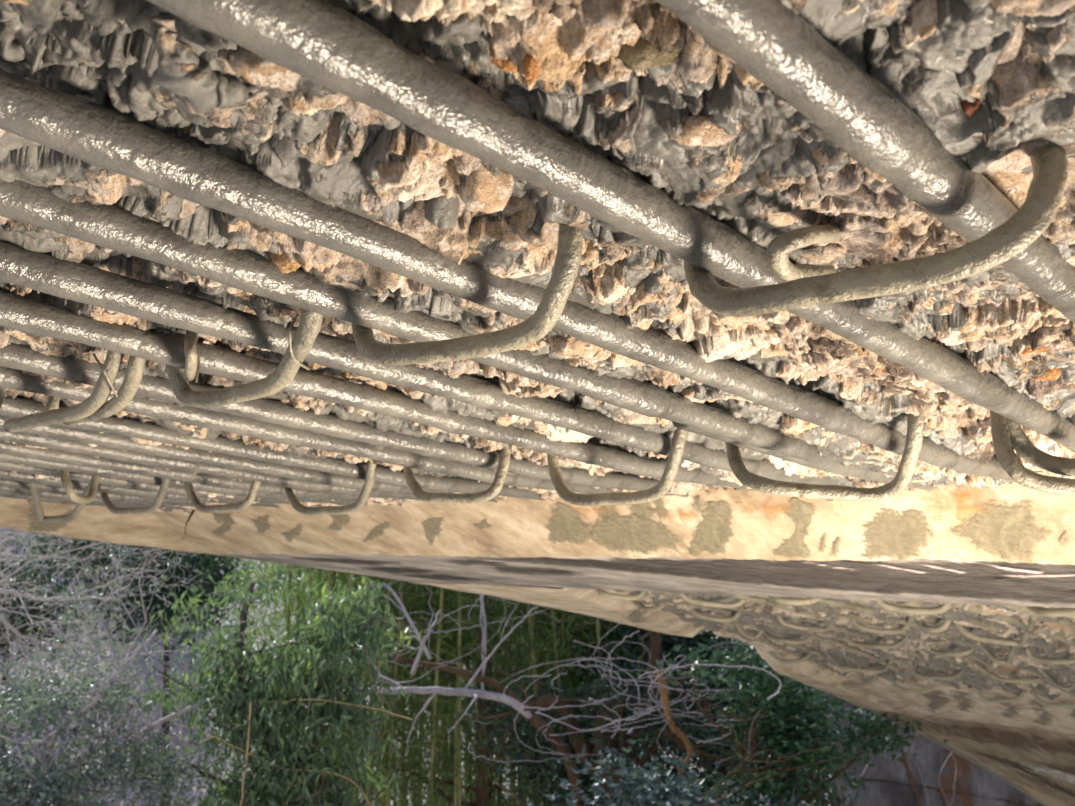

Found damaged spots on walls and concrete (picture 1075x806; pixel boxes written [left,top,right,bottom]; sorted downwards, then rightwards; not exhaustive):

spalling [780,0,1075,266]
spalling [0,0,997,461]
spalling [855,264,1075,423]
spalling [139,473,414,513]
spalling [113,410,463,478]
spalling [263,391,752,496]
spalling [478,470,558,502]
spalling [514,329,902,488]
spalling [904,460,1014,492]
spalling [1014,450,1075,479]
spalling [1021,425,1075,458]
spalling [614,590,1075,700]